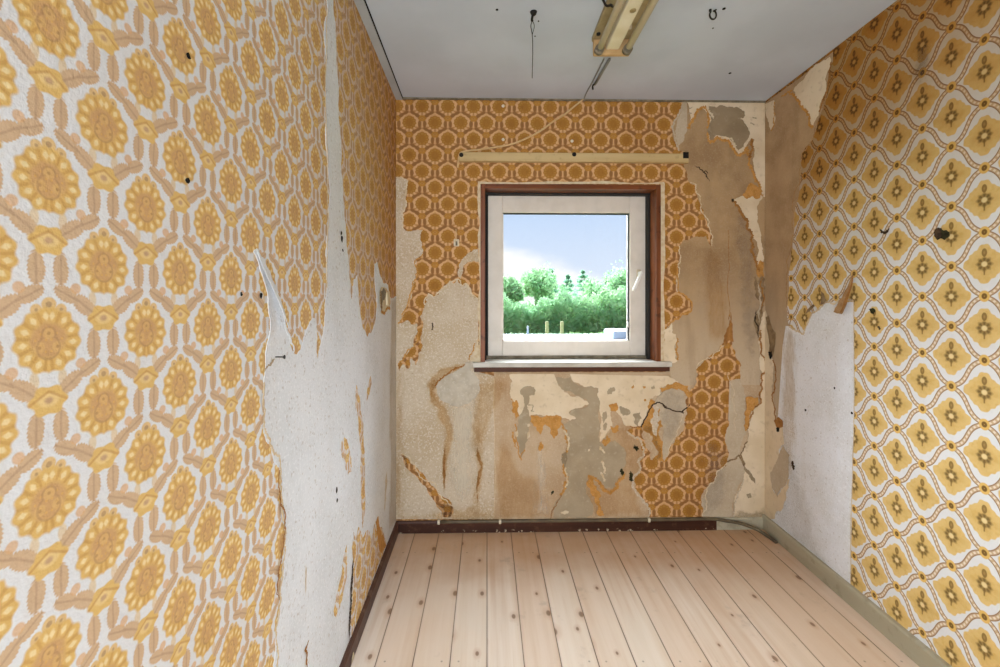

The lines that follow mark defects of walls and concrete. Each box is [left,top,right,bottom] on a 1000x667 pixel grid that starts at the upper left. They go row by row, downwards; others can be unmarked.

peeling [675,102,692,146]
flaking render [707,105,757,151]
peeling [743,183,762,199]
flaking render [468,181,679,363]
peeling [723,312,734,346]
peeling [631,385,687,461]
crack [629,402,690,428]
peeling [725,378,759,460]
flaking render [511,377,641,519]